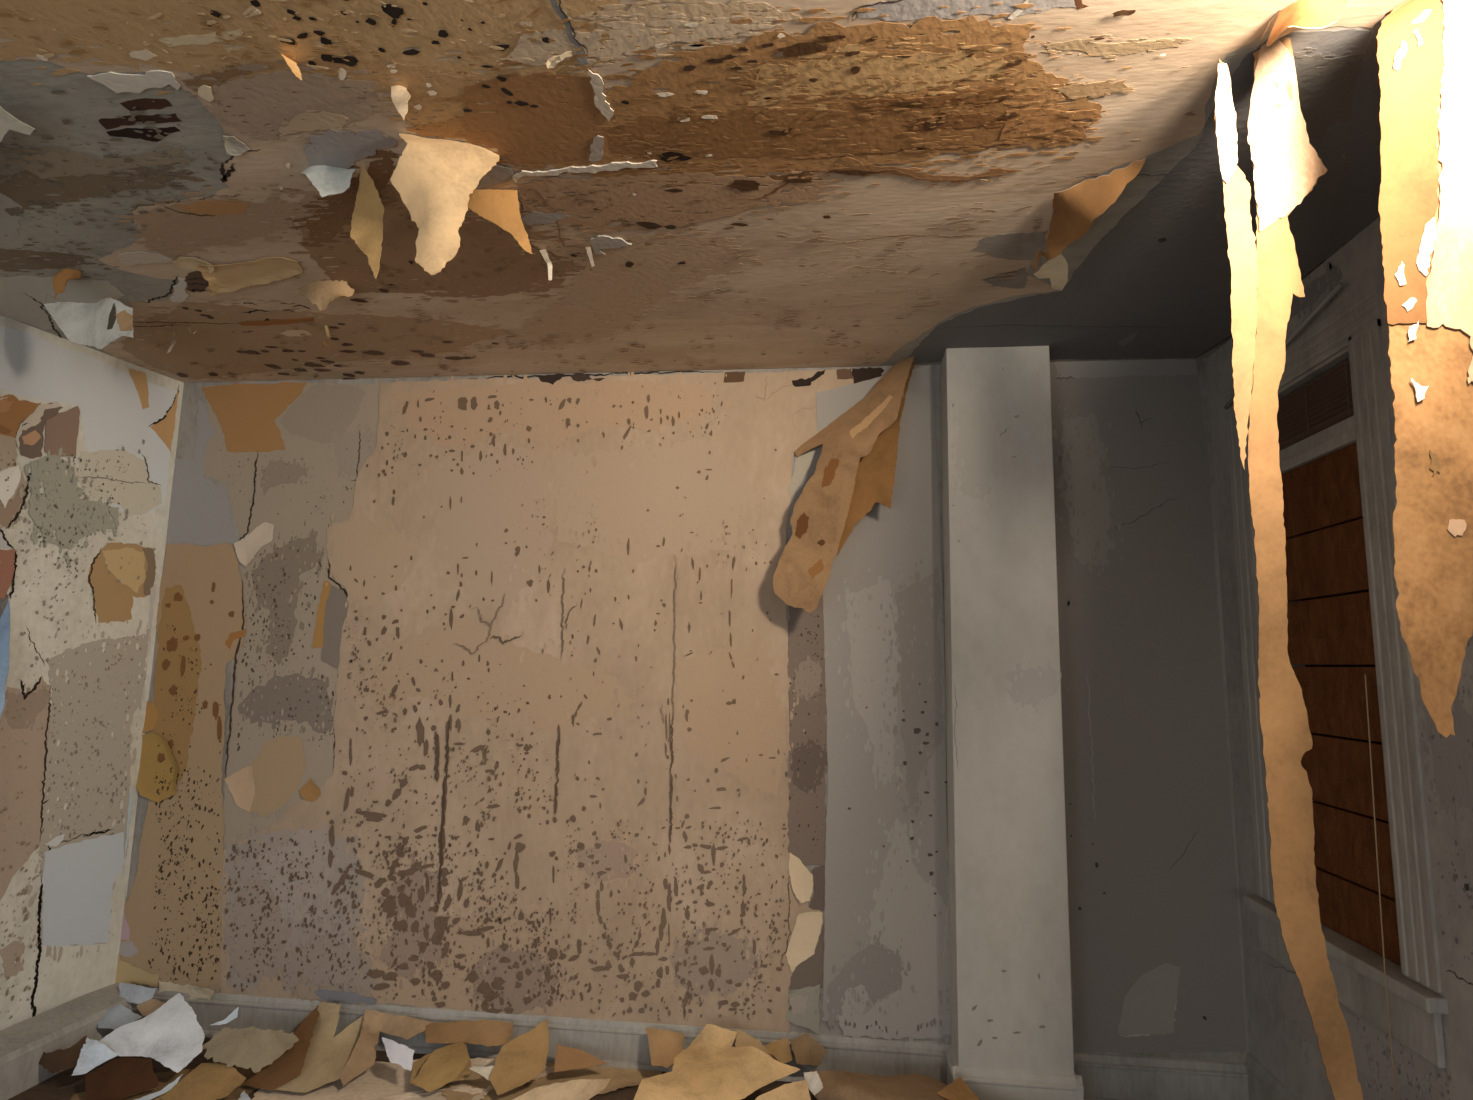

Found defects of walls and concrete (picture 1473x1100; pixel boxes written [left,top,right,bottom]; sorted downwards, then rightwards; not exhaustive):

crack [549,0,590,68]
flaking render [475,165,514,190]
peeling [118,251,303,303]
flaking render [0,275,274,567]
flaking render [0,532,15,600]
water stain [0,0,1191,1044]
flaking render [773,14,1389,1053]
crack [453,594,521,654]
crack [561,567,577,659]
flaking render [0,678,178,957]